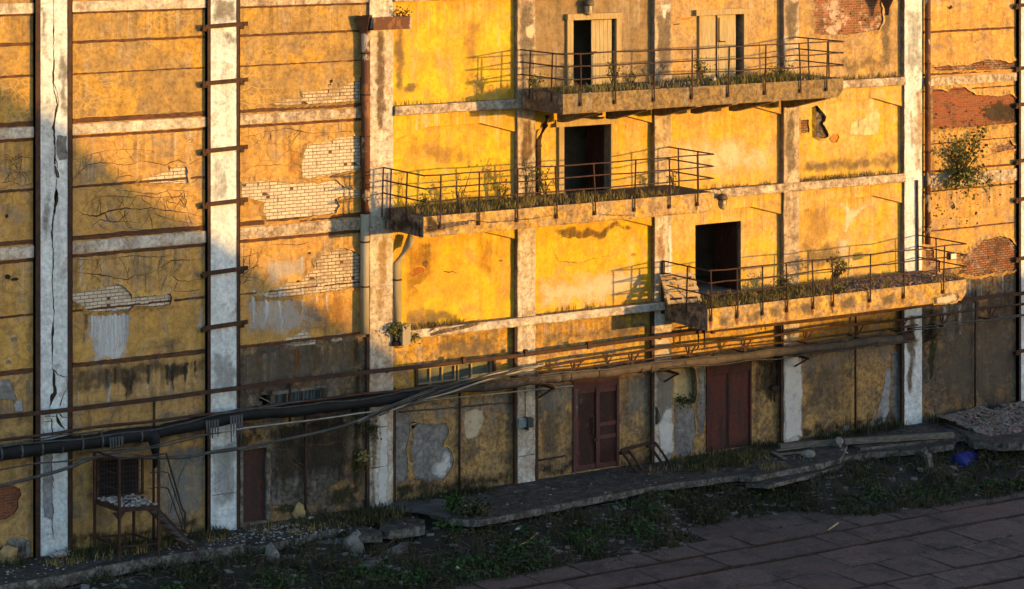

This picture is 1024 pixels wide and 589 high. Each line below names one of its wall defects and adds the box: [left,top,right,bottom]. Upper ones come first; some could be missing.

flaking render [809,0,885,40]
flaking render [268,73,361,110]
flaking render [799,105,881,143]
flaking render [931,55,1017,155]
flaking render [240,131,361,226]
crack [0,0,204,436]
flaking render [73,279,175,317]
flaking render [251,242,360,303]
flaking render [922,232,1018,279]
damp [77,308,204,408]
flaking render [396,409,455,485]
flaking render [674,367,706,457]